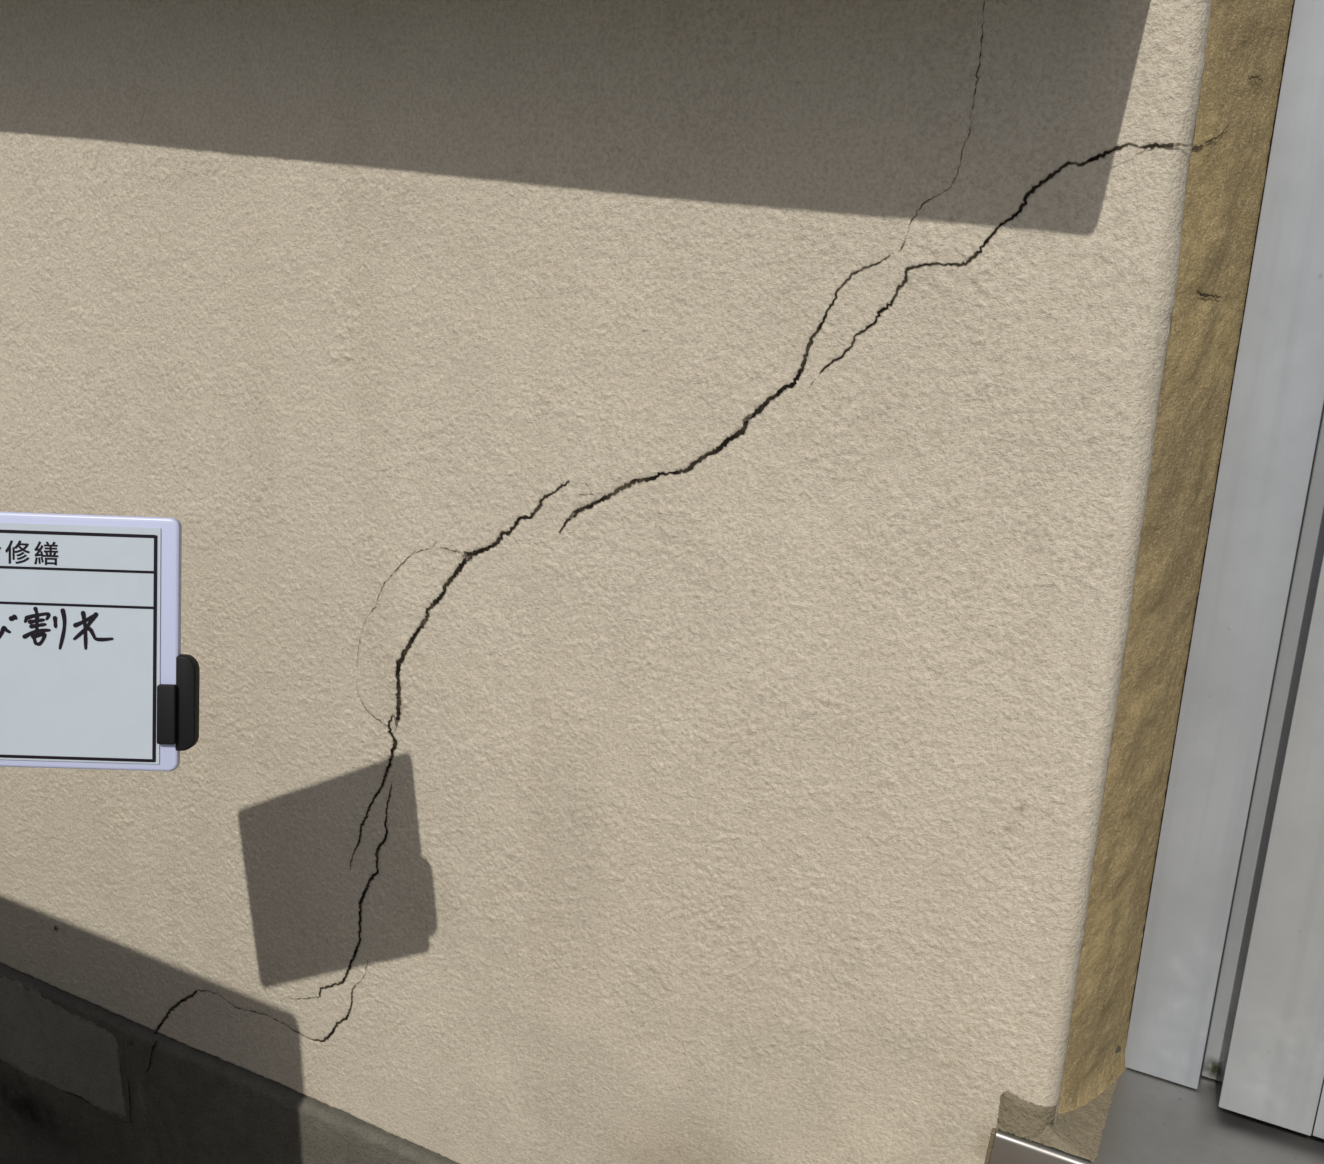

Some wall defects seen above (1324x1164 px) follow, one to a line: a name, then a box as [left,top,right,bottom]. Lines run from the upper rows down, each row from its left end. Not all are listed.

crack [972,1,985,109]
crack [63,121,1230,1123]